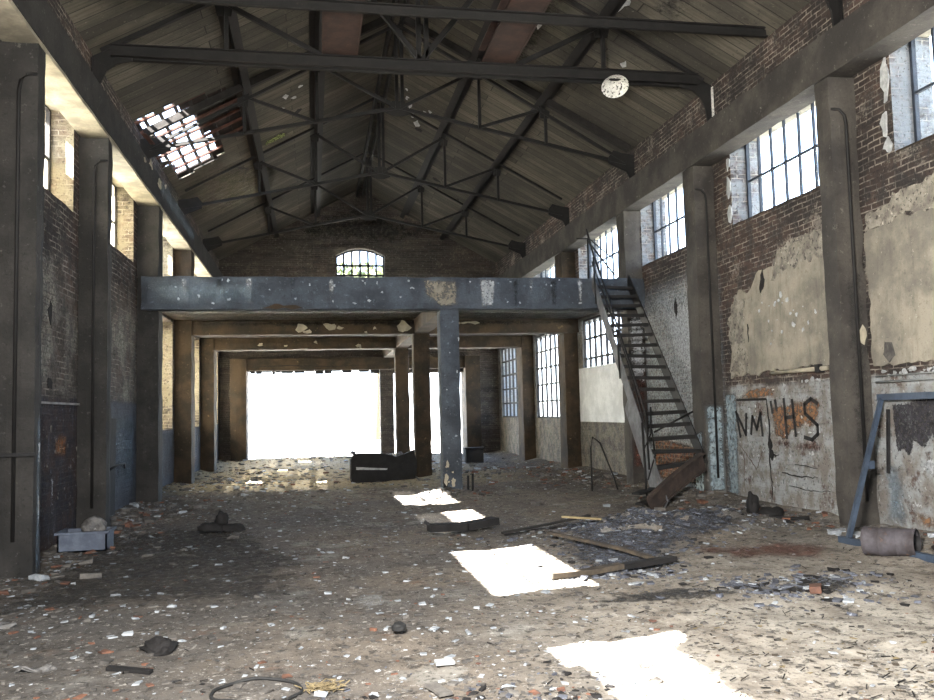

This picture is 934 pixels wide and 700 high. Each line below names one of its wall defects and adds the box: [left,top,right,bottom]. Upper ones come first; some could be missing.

flaking render [880,57,893,153]
spalling [864,172,934,233]
spalling [758,229,823,333]
spalling [727,295,750,379]
spalling [881,342,934,377]